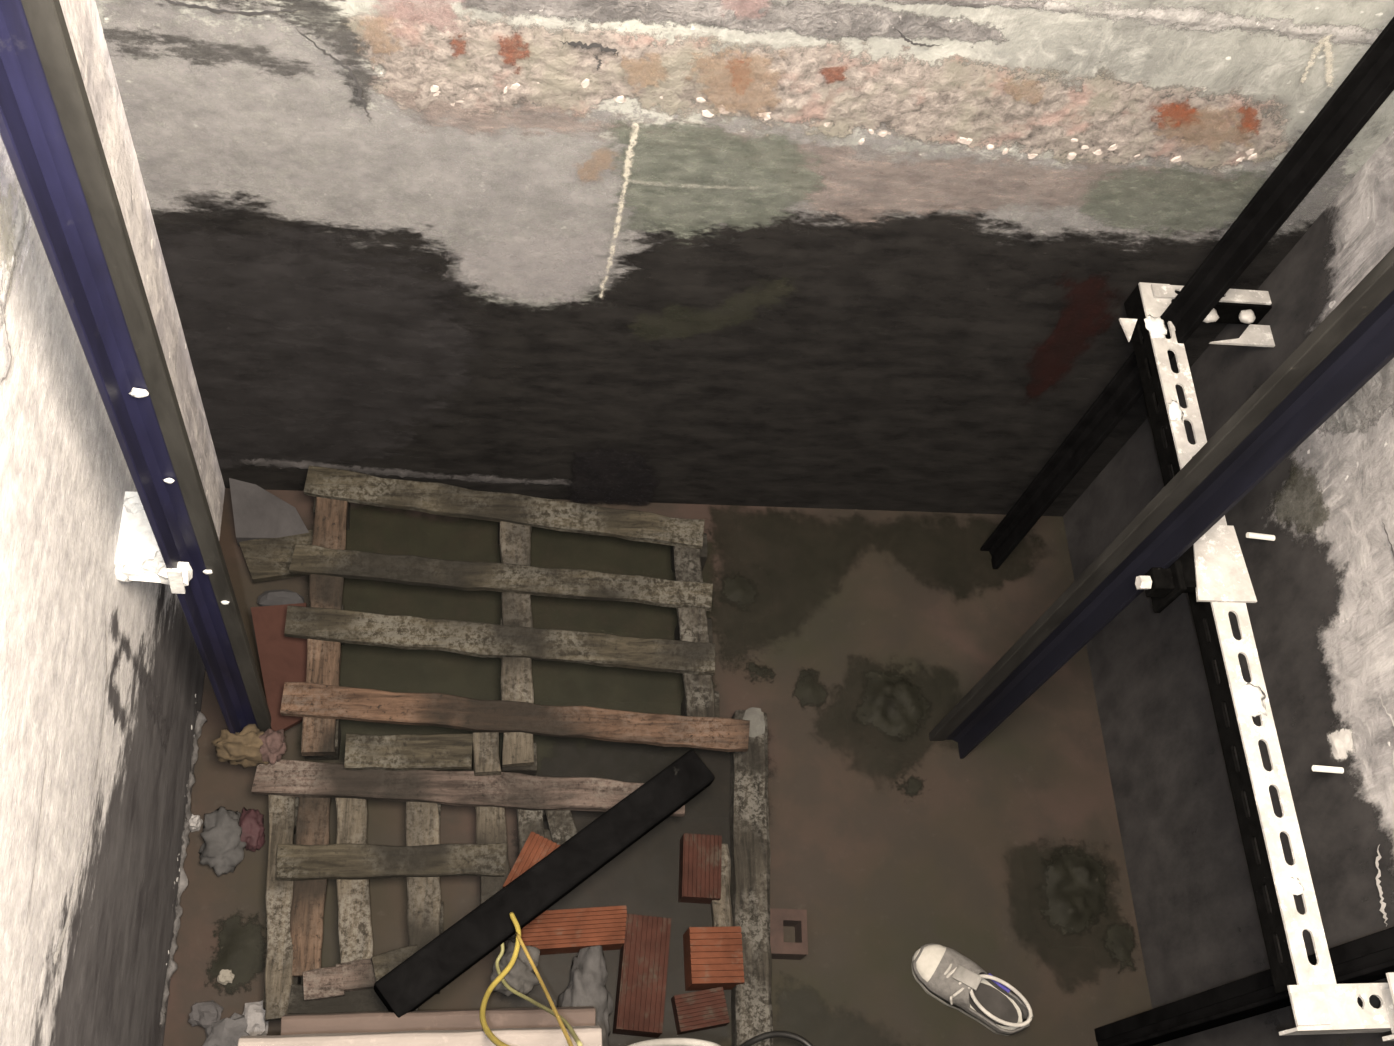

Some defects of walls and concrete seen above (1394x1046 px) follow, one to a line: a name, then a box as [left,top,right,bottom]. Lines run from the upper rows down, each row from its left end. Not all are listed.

water stain [101,0,1301,515]
spalling [340,0,1297,174]